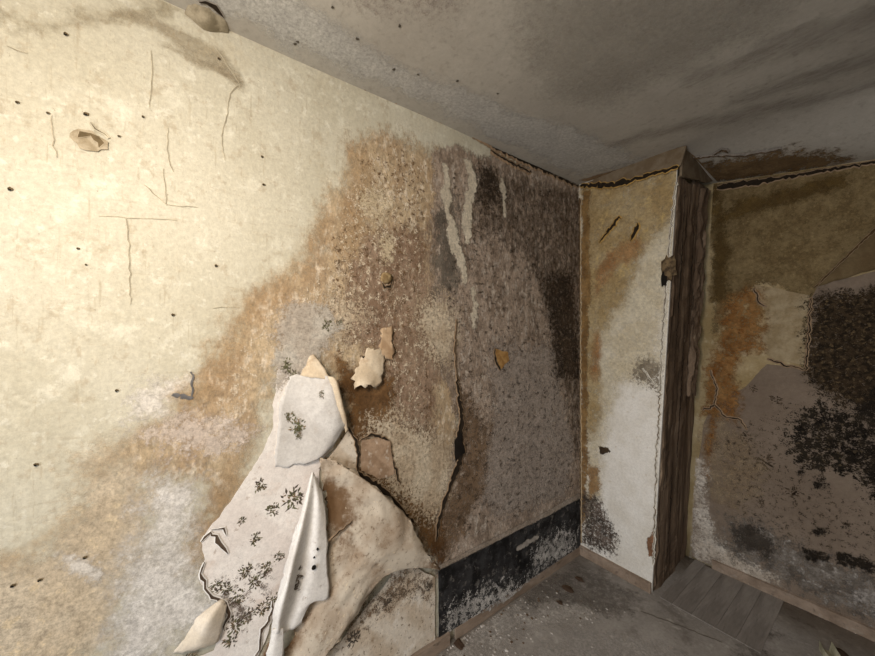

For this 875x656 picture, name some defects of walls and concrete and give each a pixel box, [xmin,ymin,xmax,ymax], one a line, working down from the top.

spalling [69,122,110,152]
crack [98,127,198,304]
crack [215,48,241,160]
peeling [814,228,875,288]
water stain [0,127,677,656]
peeling [351,326,395,389]
crack [347,319,466,542]
rust [701,287,769,509]
water stain [690,143,875,627]
peeling [173,599,227,653]
peeling [271,431,440,656]